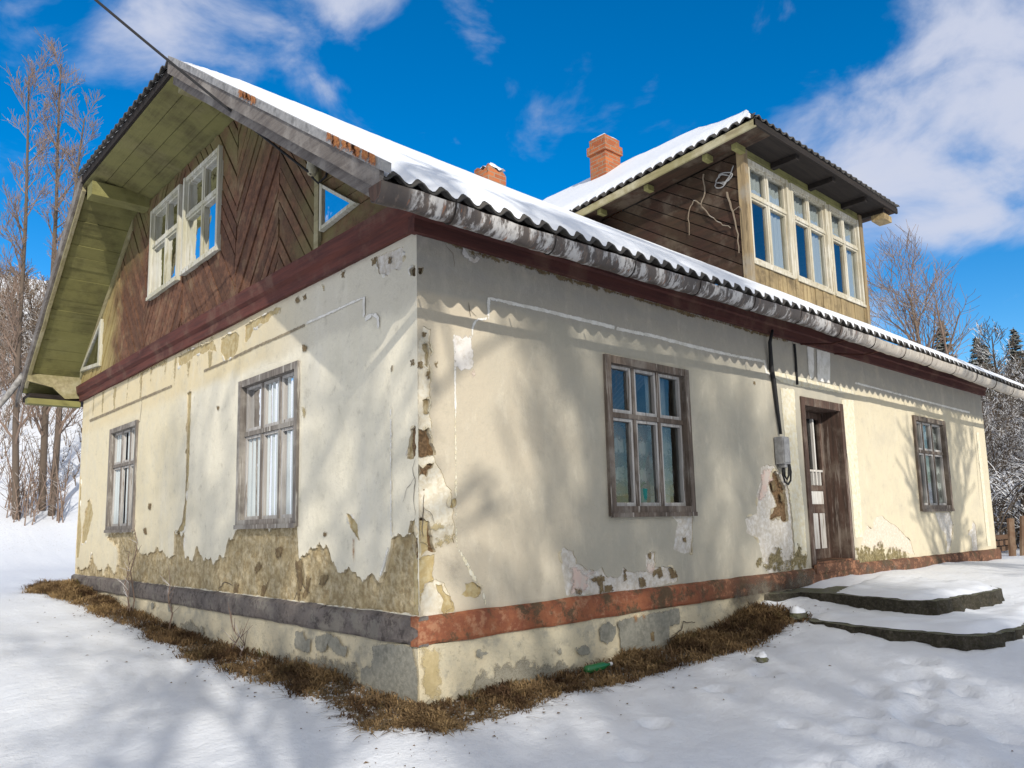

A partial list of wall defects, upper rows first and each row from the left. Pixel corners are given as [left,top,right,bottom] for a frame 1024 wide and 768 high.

peeling [371,248,422,278]
peeling [178,307,281,369]
peeling [76,326,482,616]
peeling [670,516,694,555]
peeling [745,464,794,573]
peeling [861,516,914,555]
peeling [558,547,678,596]